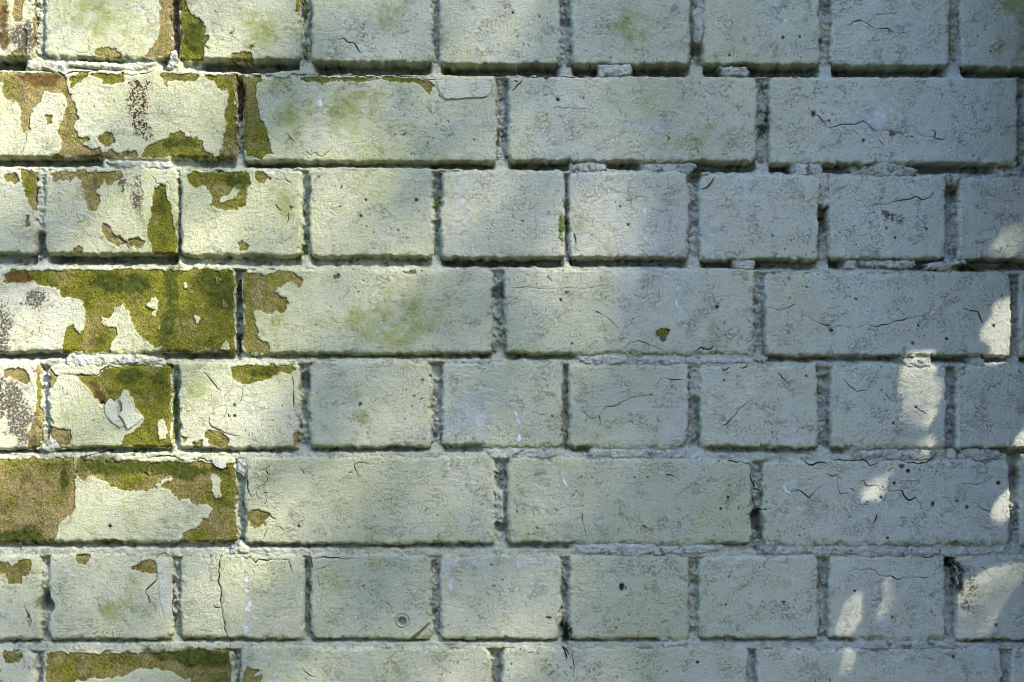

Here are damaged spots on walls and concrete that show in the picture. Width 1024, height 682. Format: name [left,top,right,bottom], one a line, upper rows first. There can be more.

peeling [0,0,492,211]
crack [808,108,945,144]
peeling [4,169,38,227]
peeling [102,184,180,257]
crack [872,191,934,206]
peeling [0,268,303,543]
crack [788,451,1002,514]
peeling [44,647,263,682]